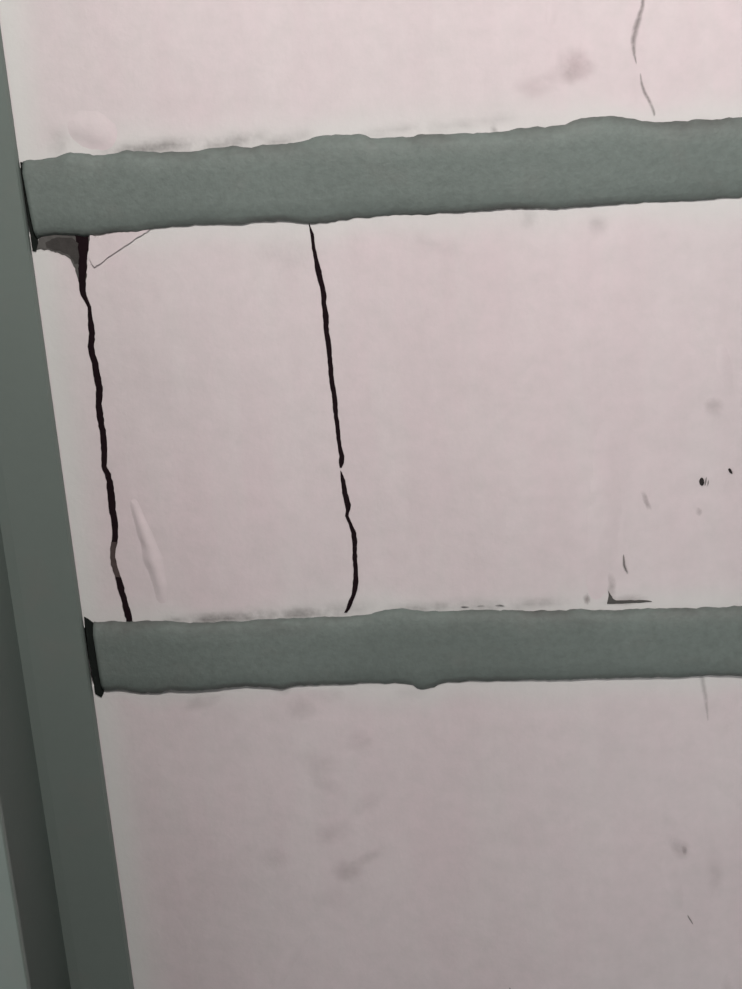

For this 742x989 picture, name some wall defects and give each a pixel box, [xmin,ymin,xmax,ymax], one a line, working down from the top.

crack [75,235,132,622]
crack [309,224,359,613]